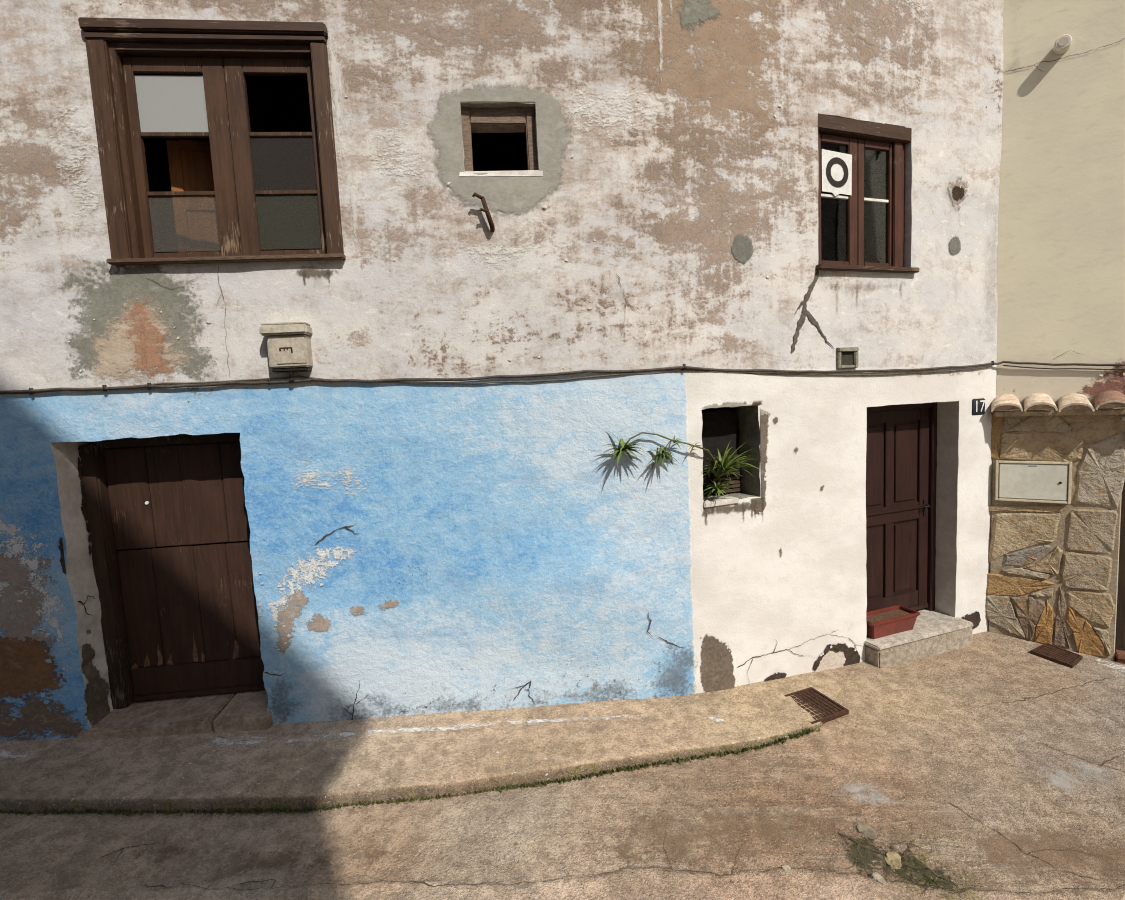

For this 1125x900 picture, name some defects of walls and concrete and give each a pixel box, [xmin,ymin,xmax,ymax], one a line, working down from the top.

crack [1004,38,1125,73]
peeling [0,94,83,238]
peeling [341,0,937,352]
peeling [406,284,676,374]
crack [791,270,835,353]
crack [315,524,359,545]
peeling [0,506,110,741]
peeling [256,536,356,655]
crack [647,612,690,648]
spalling [700,634,735,692]
crack [738,629,864,674]
spalling [812,643,860,672]